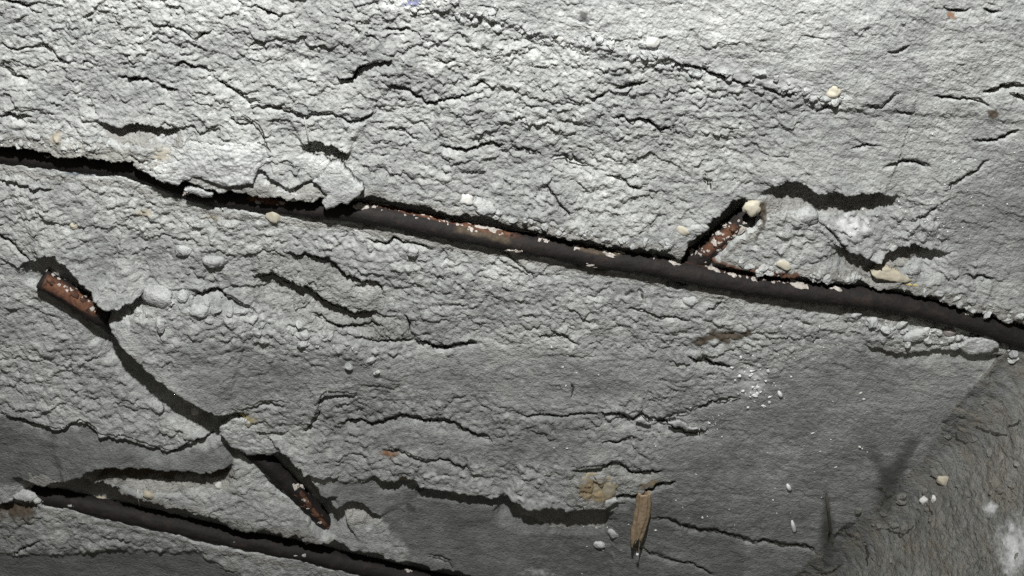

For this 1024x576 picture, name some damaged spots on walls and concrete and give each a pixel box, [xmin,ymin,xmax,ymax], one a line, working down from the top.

corrosion [39,275,95,315]
spalling [0,122,666,289]
crack [254,253,477,349]
corrosion [368,202,512,244]
corrosion [685,225,799,282]
corrosion [755,201,766,240]
spalling [688,286,1009,358]
spalling [717,182,1024,324]
crack [910,129,1019,221]
peeling [111,250,424,503]
crack [259,391,493,442]
crack [513,385,741,498]